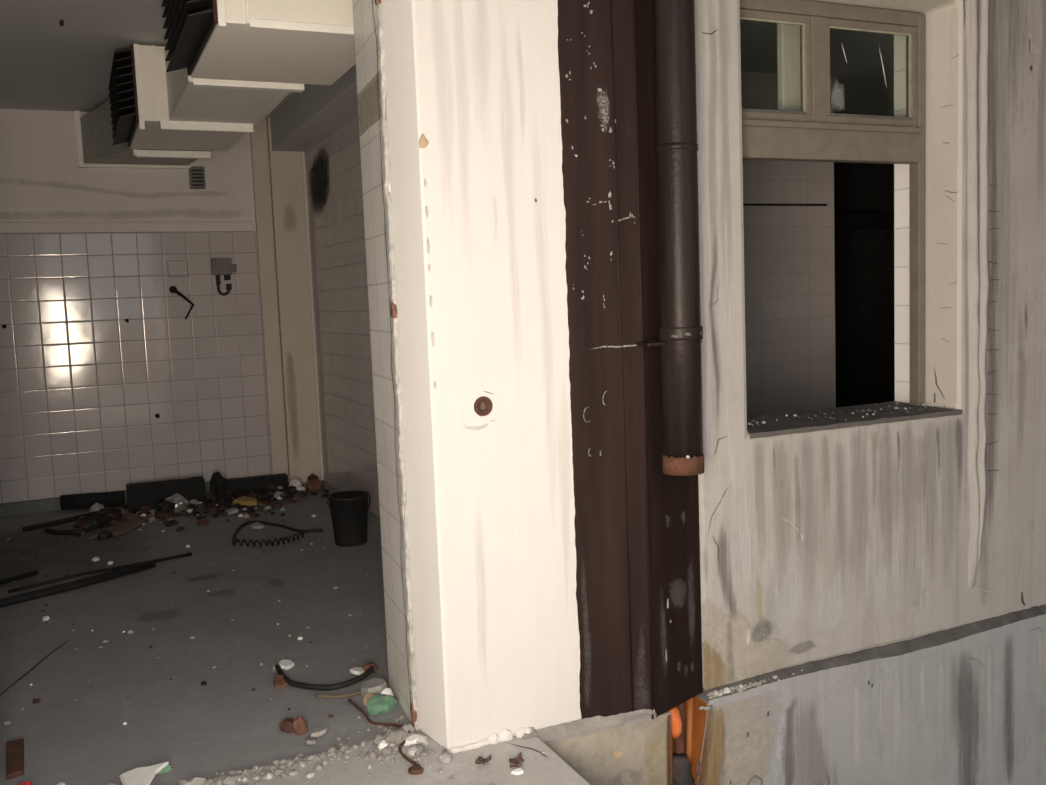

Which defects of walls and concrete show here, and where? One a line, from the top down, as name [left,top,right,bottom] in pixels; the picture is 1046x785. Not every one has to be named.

leakage [978,0,996,493]
corrosion [474,396,493,416]
leakage [665,538,781,690]